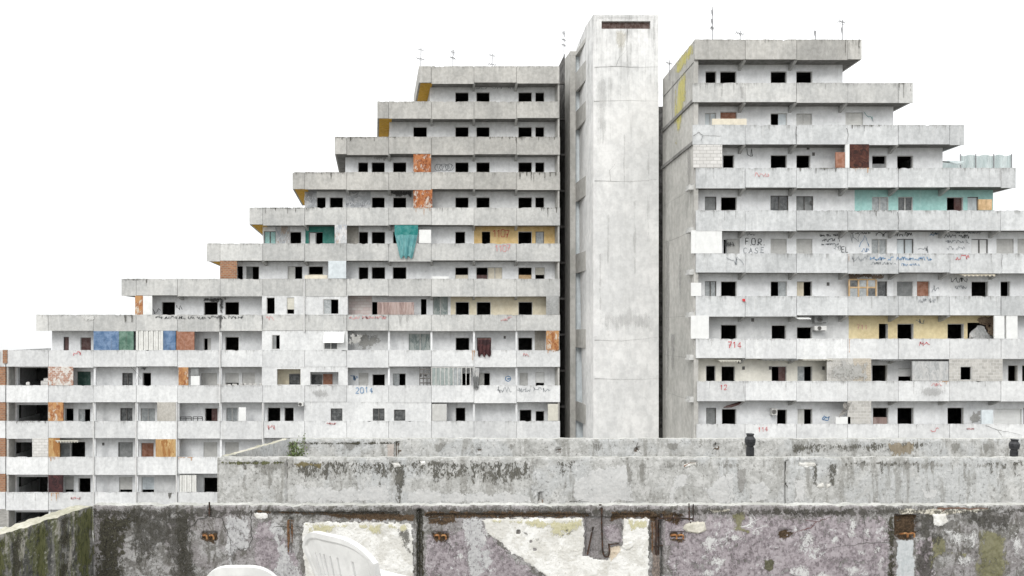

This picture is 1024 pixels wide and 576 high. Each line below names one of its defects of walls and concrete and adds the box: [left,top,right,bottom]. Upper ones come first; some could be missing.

rust [413,189,432,208]
spalling [977,316,993,336]
rust [546,331,559,352]
damp [295,461,393,487]
damp [412,460,530,484]
flaking render [474,516,660,576]